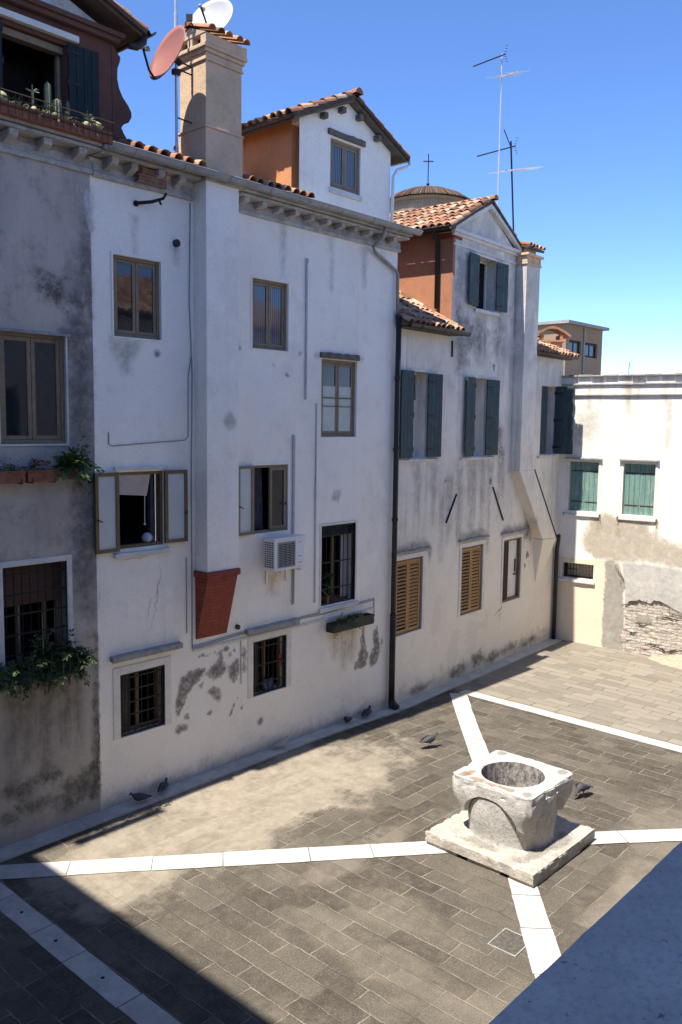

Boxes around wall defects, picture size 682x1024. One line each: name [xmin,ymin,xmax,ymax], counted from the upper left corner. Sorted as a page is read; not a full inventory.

flaking render [584,514,682,656]
peeling [175,645,240,734]
peeling [354,626,383,670]